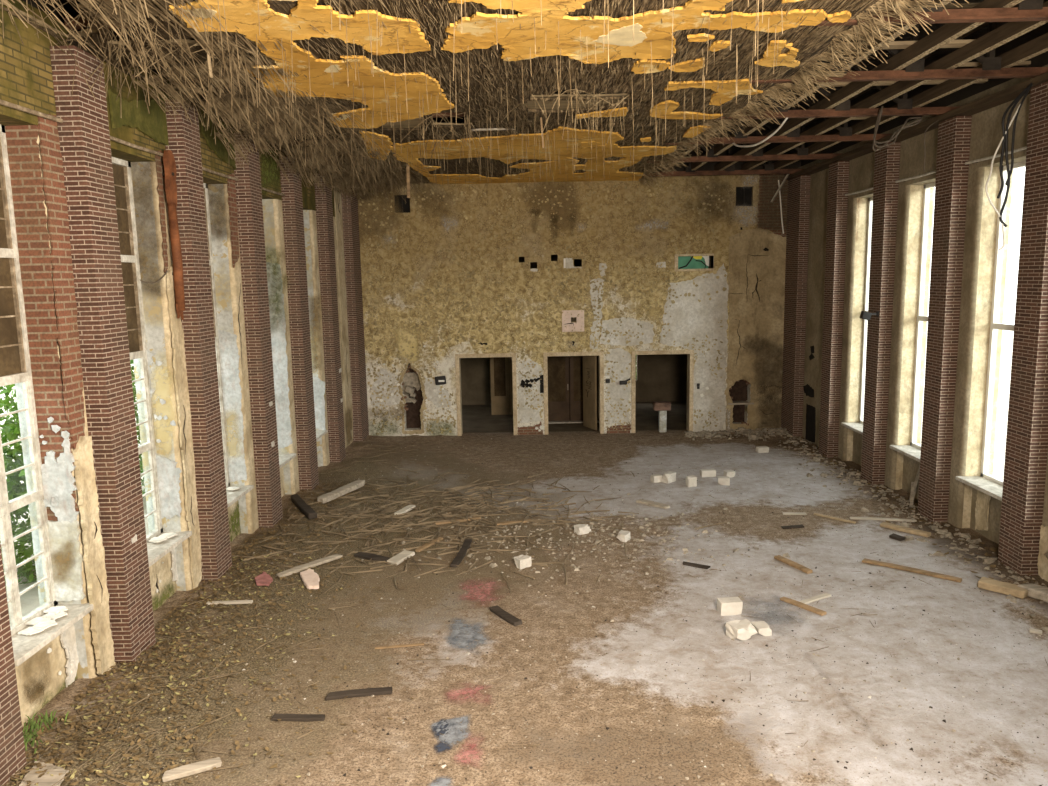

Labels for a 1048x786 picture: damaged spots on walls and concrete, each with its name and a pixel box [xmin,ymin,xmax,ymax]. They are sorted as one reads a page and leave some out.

flaking render [593,23,647,47]
leakage [130,161,160,294]
leakage [207,184,227,236]
peeling [200,107,239,268]
peeling [359,157,791,435]
crack [731,255,769,302]
flaking render [5,114,85,687]